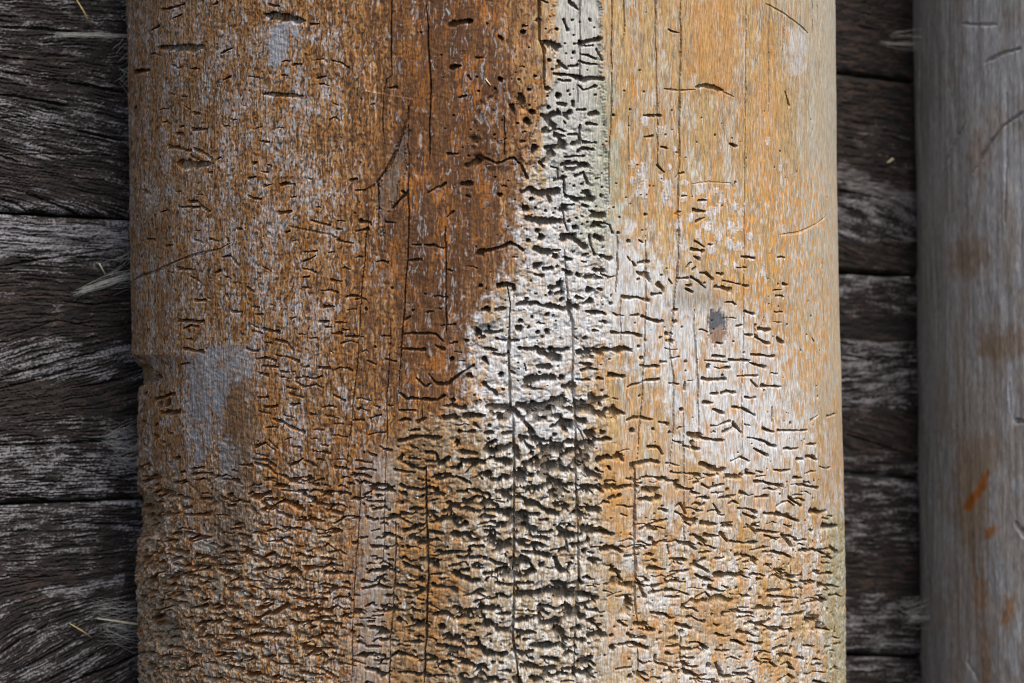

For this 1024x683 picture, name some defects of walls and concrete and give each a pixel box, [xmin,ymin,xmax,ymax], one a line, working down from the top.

crack [348,0,432,455]
crack [507,285,520,683]
corrosion [961,469,990,512]